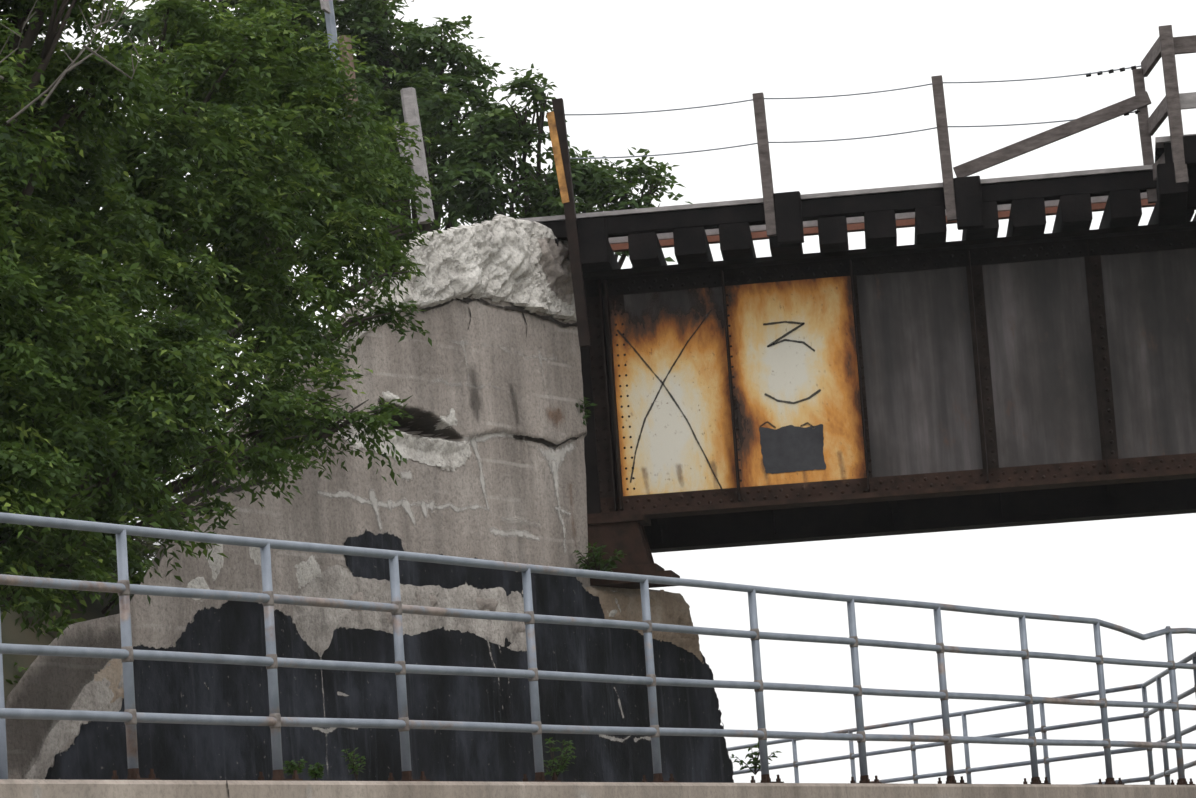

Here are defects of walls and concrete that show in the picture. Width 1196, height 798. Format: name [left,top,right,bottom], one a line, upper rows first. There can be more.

spalling [332,391,471,472]
corrosion [610,276,866,496]
peeling [131,514,527,708]
spalling [586,587,704,664]
peeling [23,659,124,779]